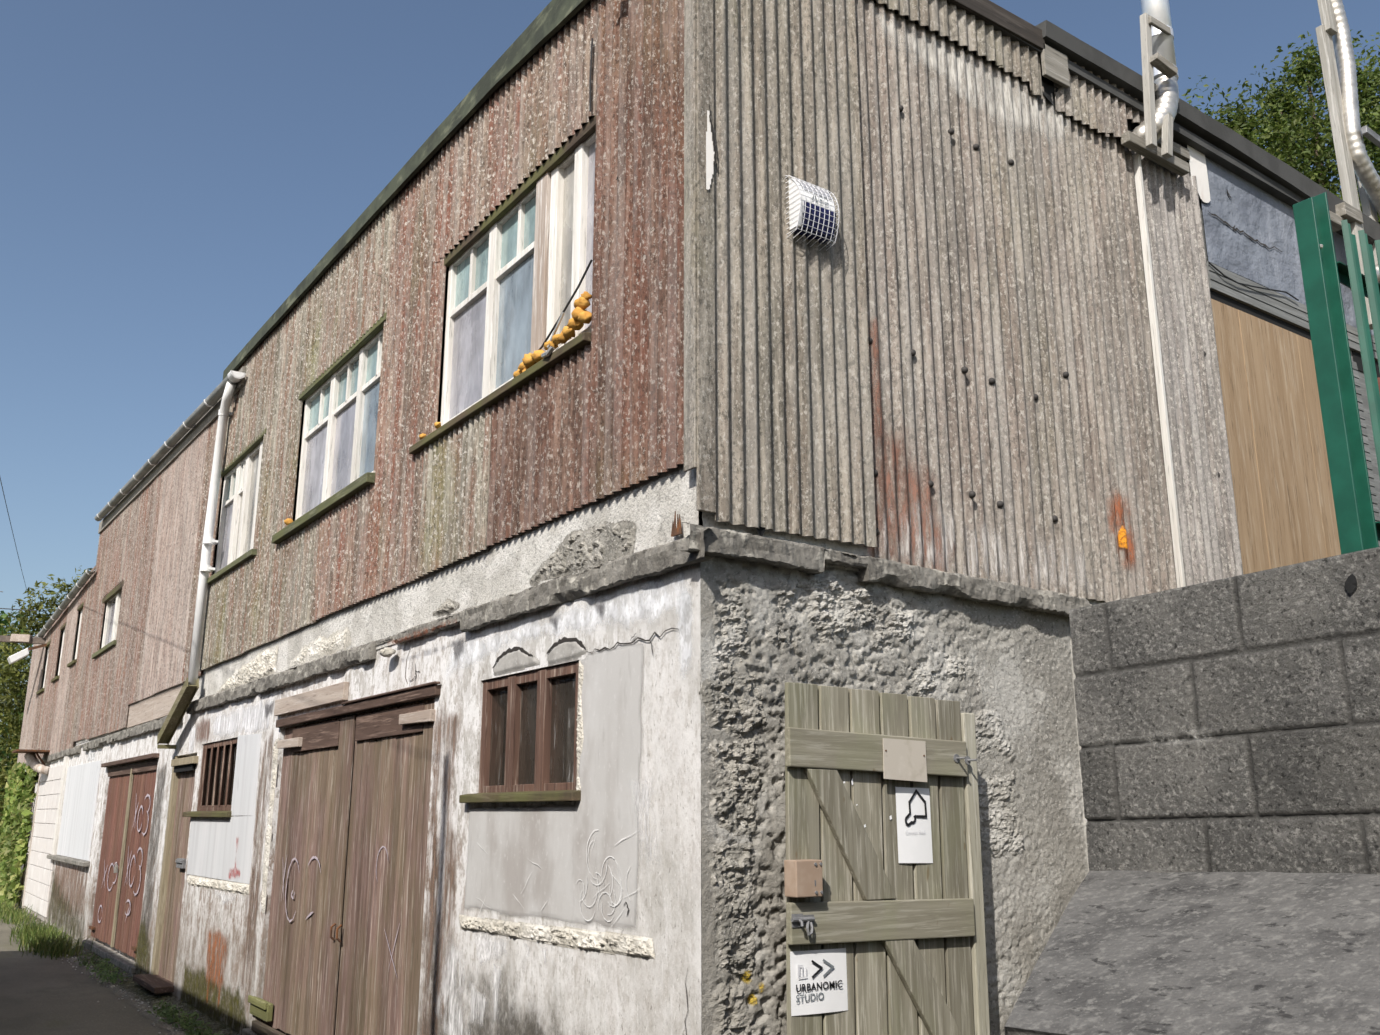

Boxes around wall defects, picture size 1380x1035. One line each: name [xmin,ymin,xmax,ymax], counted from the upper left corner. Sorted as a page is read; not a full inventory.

corrosion [871,322,945,567]
spalling [529,520,636,587]
corrosion [1110,496,1134,565]
spalling [217,627,351,693]
water stain [420,715,542,1035]
corrosion [206,931,227,1005]